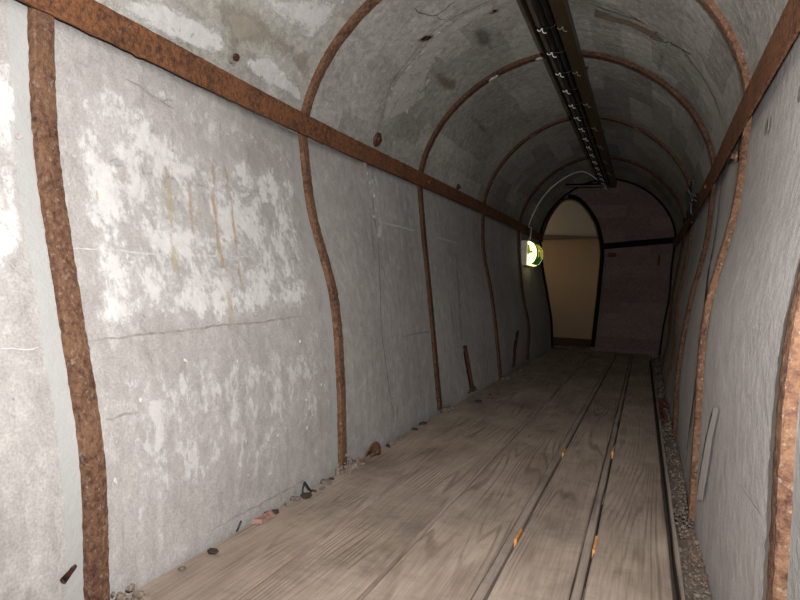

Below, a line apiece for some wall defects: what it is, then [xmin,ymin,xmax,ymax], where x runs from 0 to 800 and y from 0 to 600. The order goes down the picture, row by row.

crack [88,316,301,341]